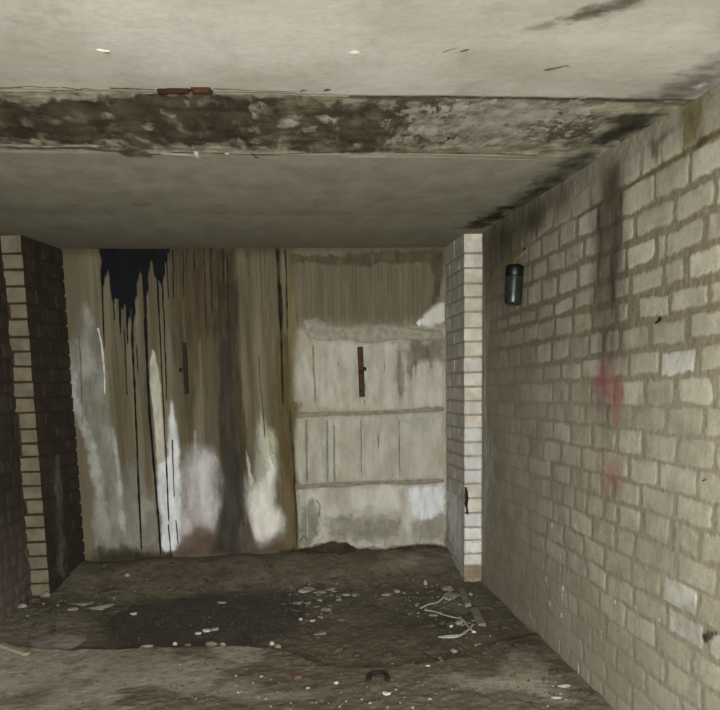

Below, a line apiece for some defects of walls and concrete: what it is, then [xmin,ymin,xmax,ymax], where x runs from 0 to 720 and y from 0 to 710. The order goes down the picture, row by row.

leakage [569,0,638,21]
leakage [0,94,653,153]
leakage [471,153,593,260]
leakage [71,249,282,557]